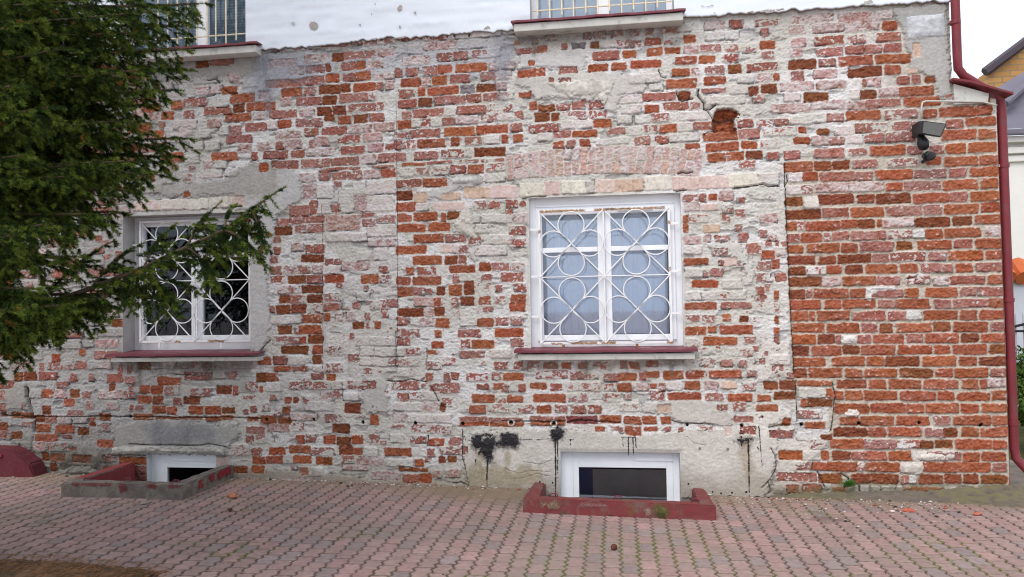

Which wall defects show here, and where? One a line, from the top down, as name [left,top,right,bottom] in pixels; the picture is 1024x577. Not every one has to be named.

crack [658,71,716,133]
spalling [712,109,741,134]
crack [734,163,798,493]